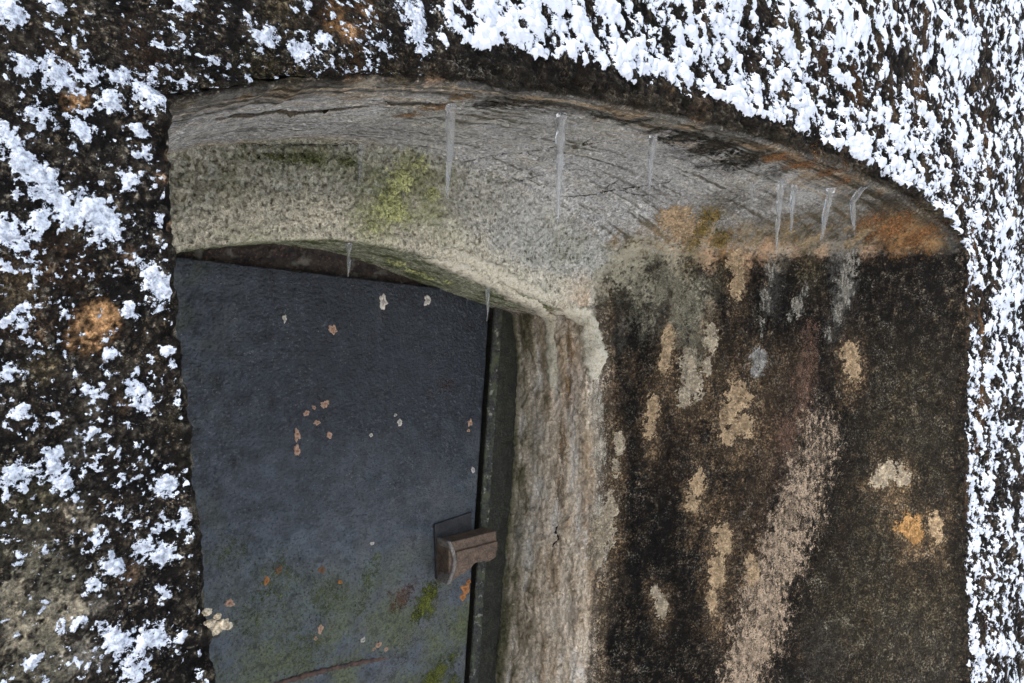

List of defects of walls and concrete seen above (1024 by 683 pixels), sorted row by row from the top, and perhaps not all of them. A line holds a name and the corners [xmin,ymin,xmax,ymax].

water stain [585,368,608,581]
water stain [715,247,862,683]